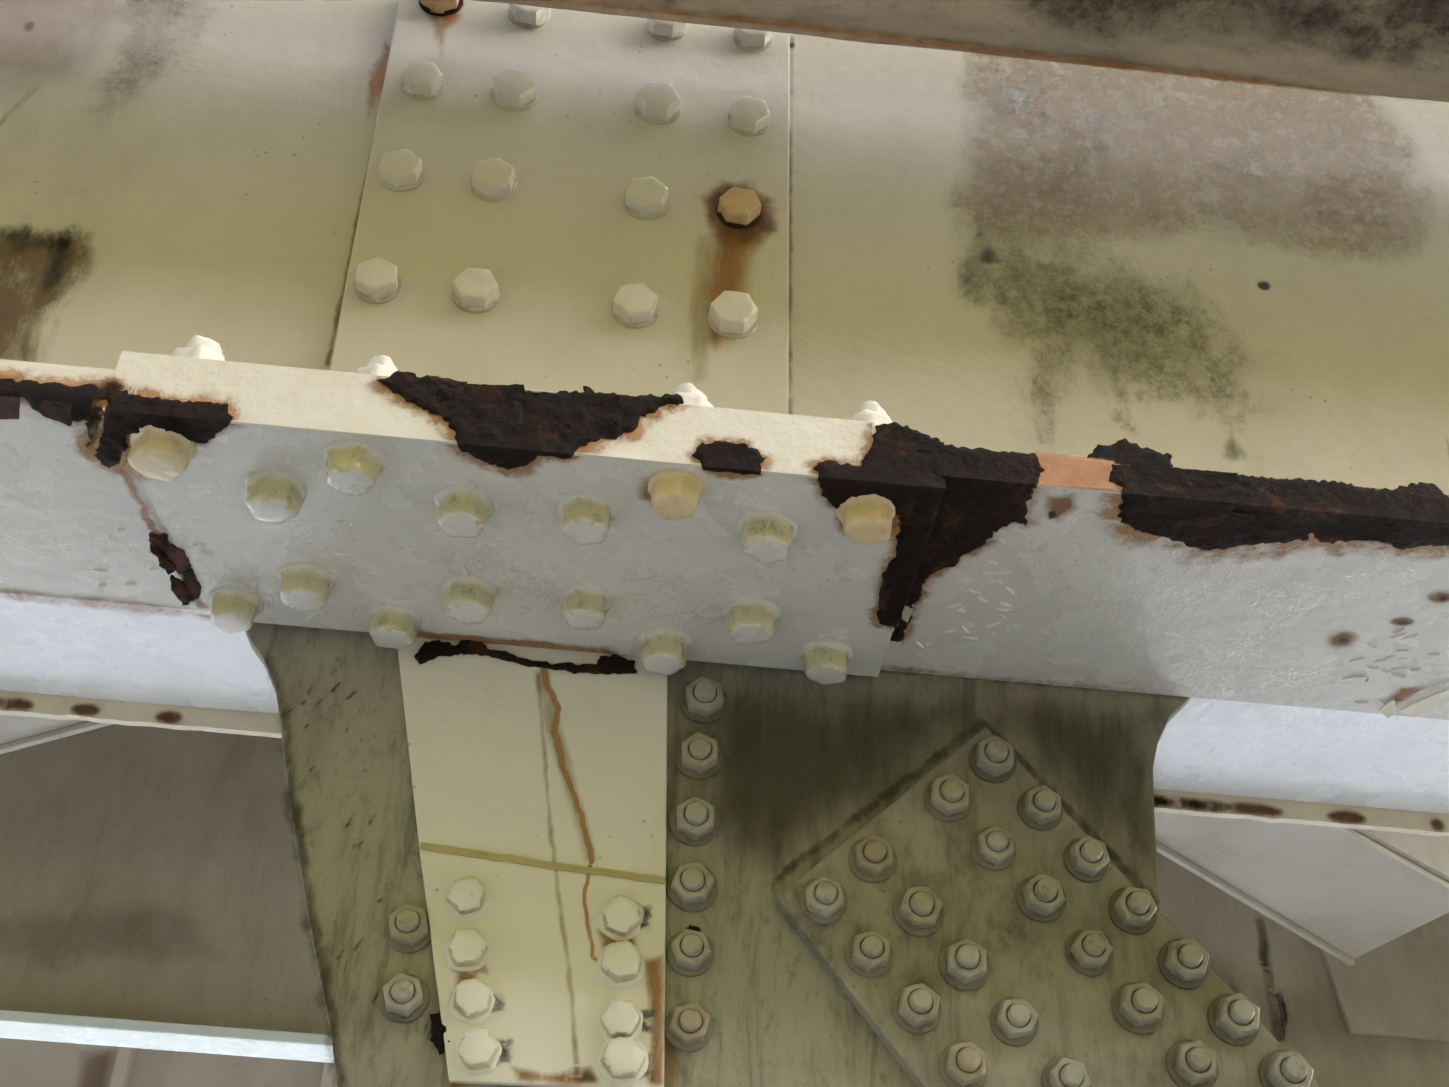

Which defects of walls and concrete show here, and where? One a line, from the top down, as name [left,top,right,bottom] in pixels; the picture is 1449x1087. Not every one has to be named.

water stain [8,232,72,289]
corrosion [706,184,792,304]
water stain [962,246,1232,398]
corrosion [0,369,236,478]
corrosion [371,371,688,476]
corrosion [808,422,1073,642]
corrosion [1087,438,1449,558]
corrosion [414,631,637,689]
crack [541,667,597,961]
corrosion [1154,795,1282,816]
corrosion [1328,810,1365,824]
crack [1260,926,1287,1041]